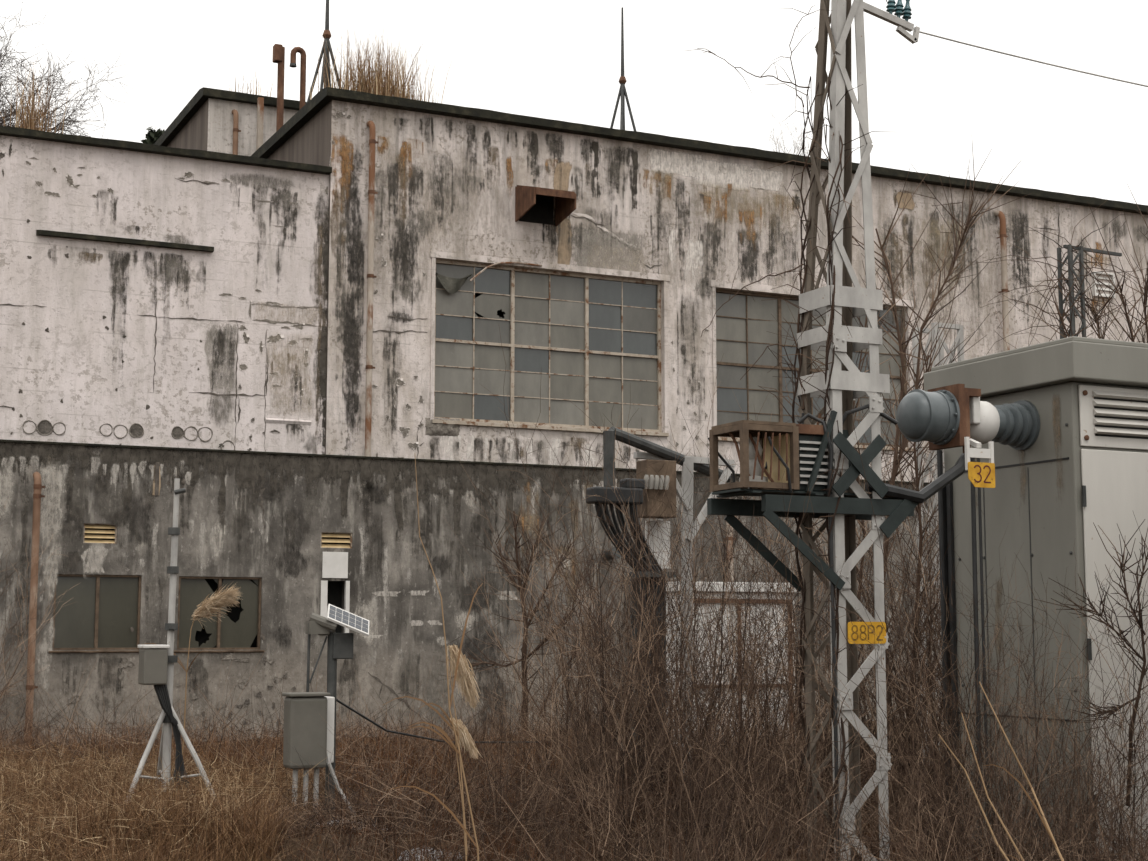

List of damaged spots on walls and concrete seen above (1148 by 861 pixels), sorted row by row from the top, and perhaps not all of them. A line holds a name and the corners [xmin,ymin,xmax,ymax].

corrosion [377,136,423,222]
leakage [650,173,785,423]
leakage [0,126,639,730]
leakage [676,473,747,507]